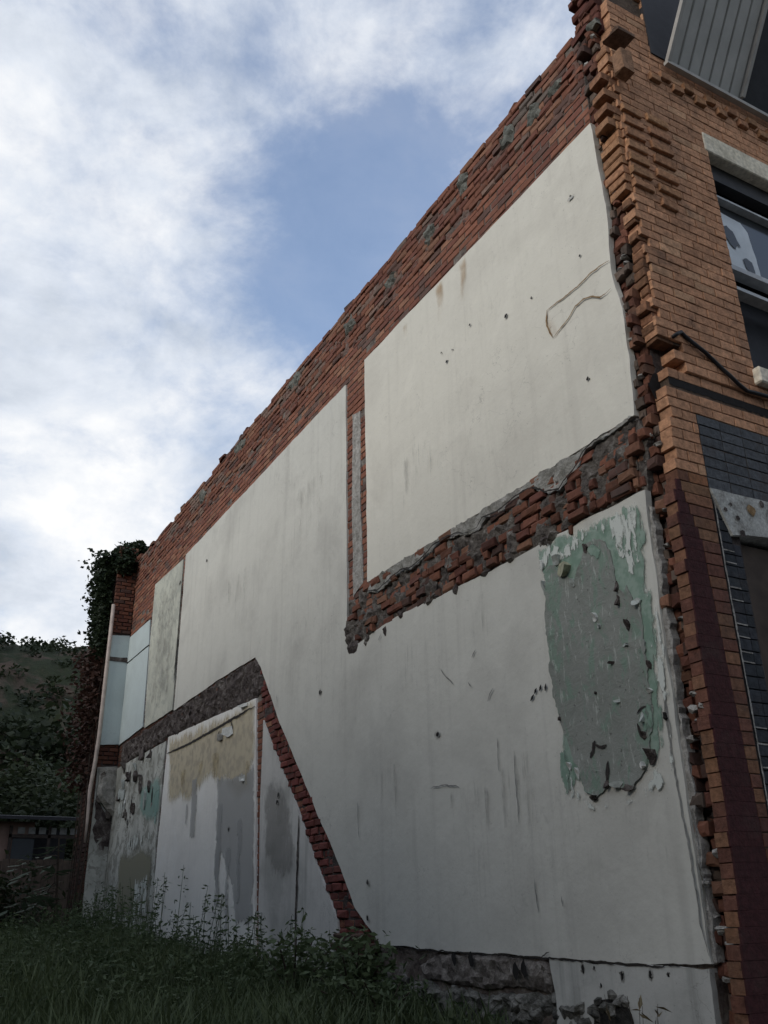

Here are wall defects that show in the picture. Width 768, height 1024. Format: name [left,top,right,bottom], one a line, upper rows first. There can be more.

crack [545,261,611,336]
peeling [344,416,725,963]
leakage [169,703,254,929]
crack [393,946,704,968]